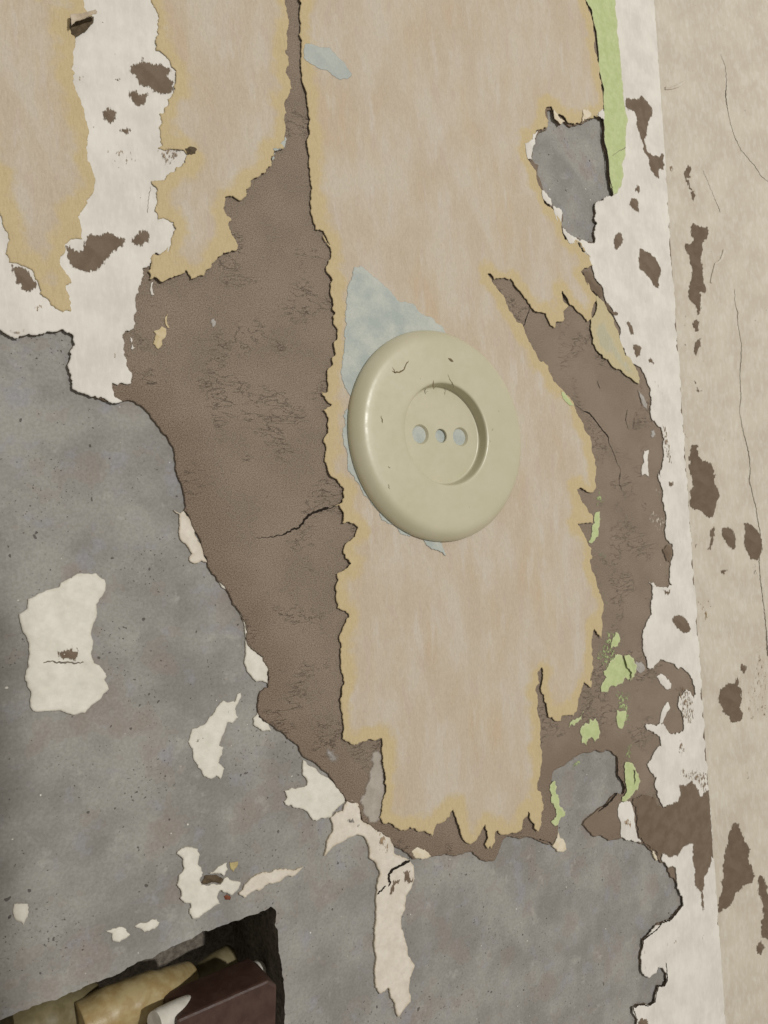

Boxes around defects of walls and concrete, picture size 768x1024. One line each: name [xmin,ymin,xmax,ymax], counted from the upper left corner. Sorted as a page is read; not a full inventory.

peeling [0,0,187,404]
crack [256,501,342,538]
spalling [0,330,682,1024]
crack [377,860,410,895]
peeling [532,0,713,899]
peeling [632,823,755,1024]